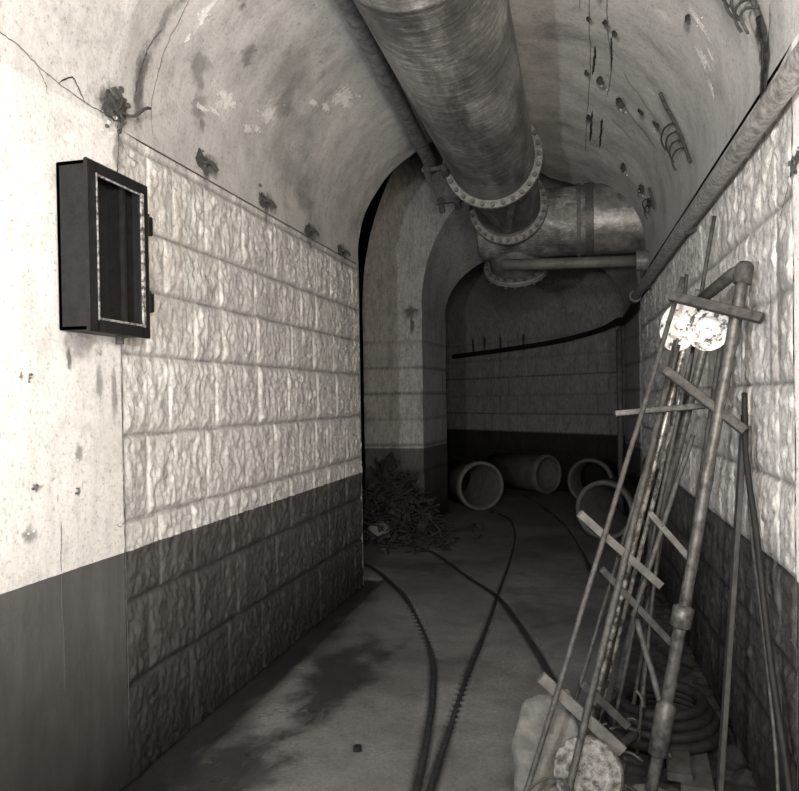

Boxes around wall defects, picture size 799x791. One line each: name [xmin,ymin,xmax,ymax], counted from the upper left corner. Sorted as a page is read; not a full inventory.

crack [135,1,189,134]
damp [295,644,391,725]